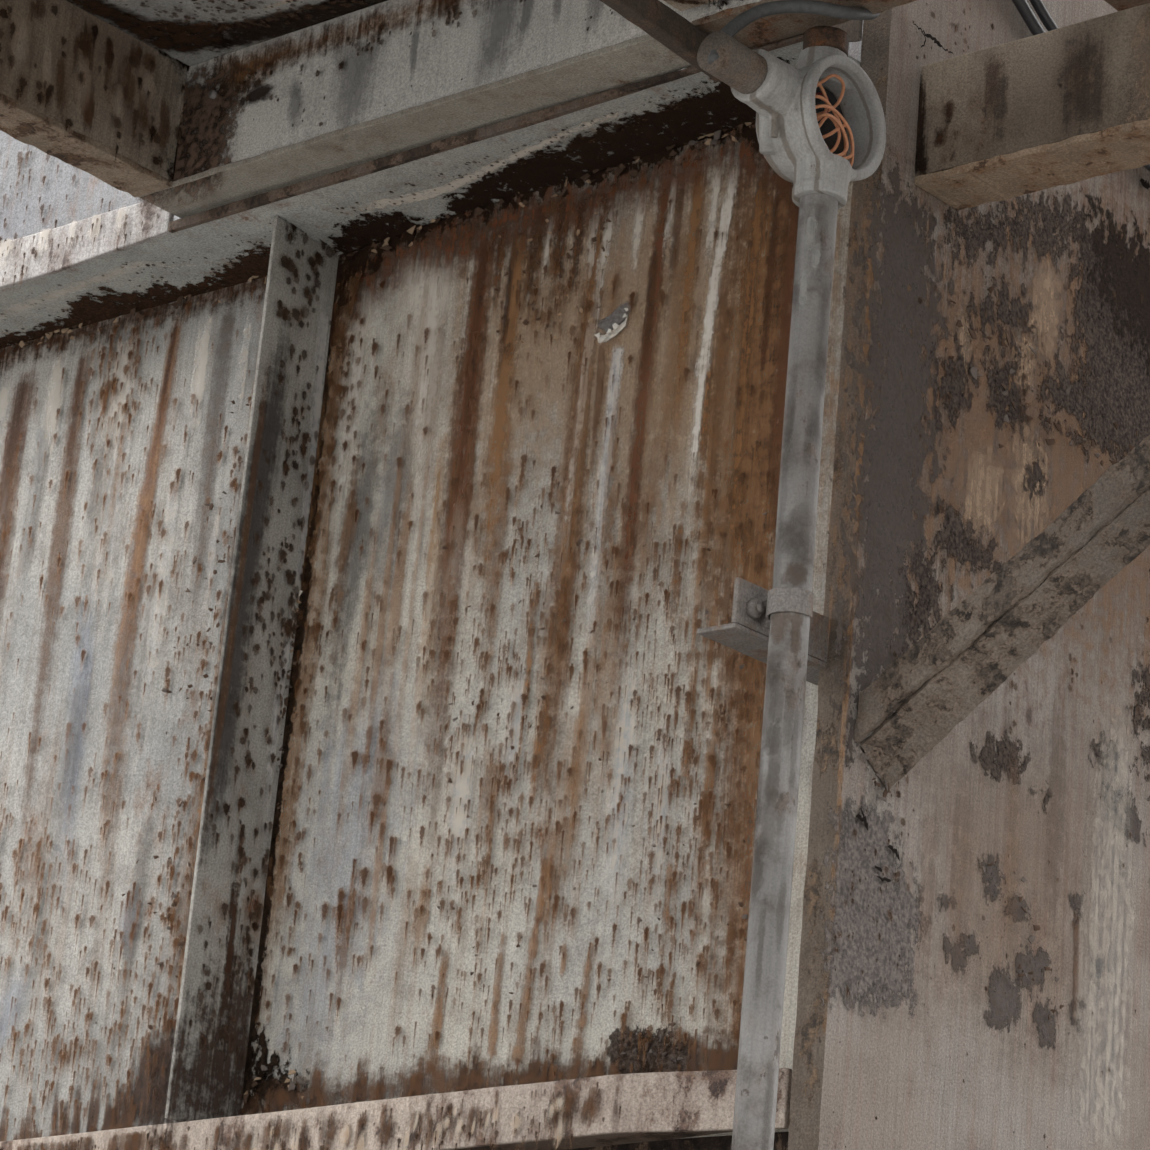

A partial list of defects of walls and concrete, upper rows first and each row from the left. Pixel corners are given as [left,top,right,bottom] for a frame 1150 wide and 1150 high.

corrosion [57,0,473,212]
peeling [595,301,632,343]
corrosion [0,81,799,1150]